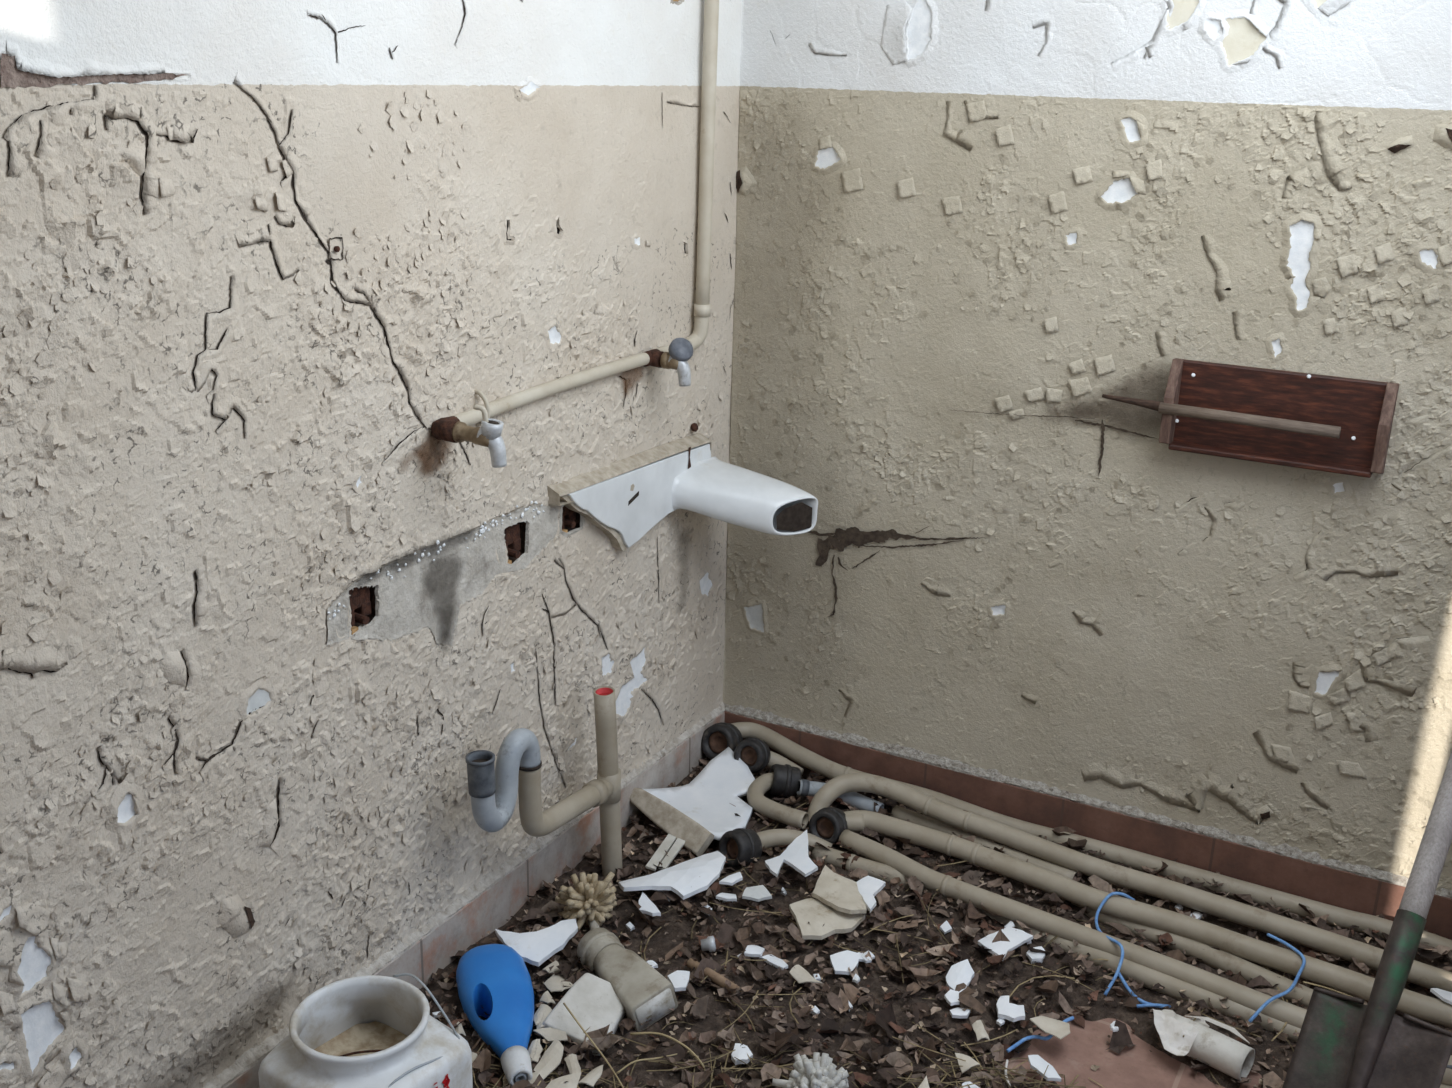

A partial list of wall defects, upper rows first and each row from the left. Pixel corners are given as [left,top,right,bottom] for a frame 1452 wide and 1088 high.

peeling [881,0,939,68]
crack [1033,12,1055,58]
crack [1111,0,1174,72]
peeling [1159,0,1274,74]
crack [1249,0,1300,69]
peeling [1302,0,1356,18]
crack [4,85,198,215]
crack [178,71,472,466]
flaking render [0,170,868,1088]
crack [162,565,271,783]
crack [536,553,614,788]
crack [95,742,128,797]